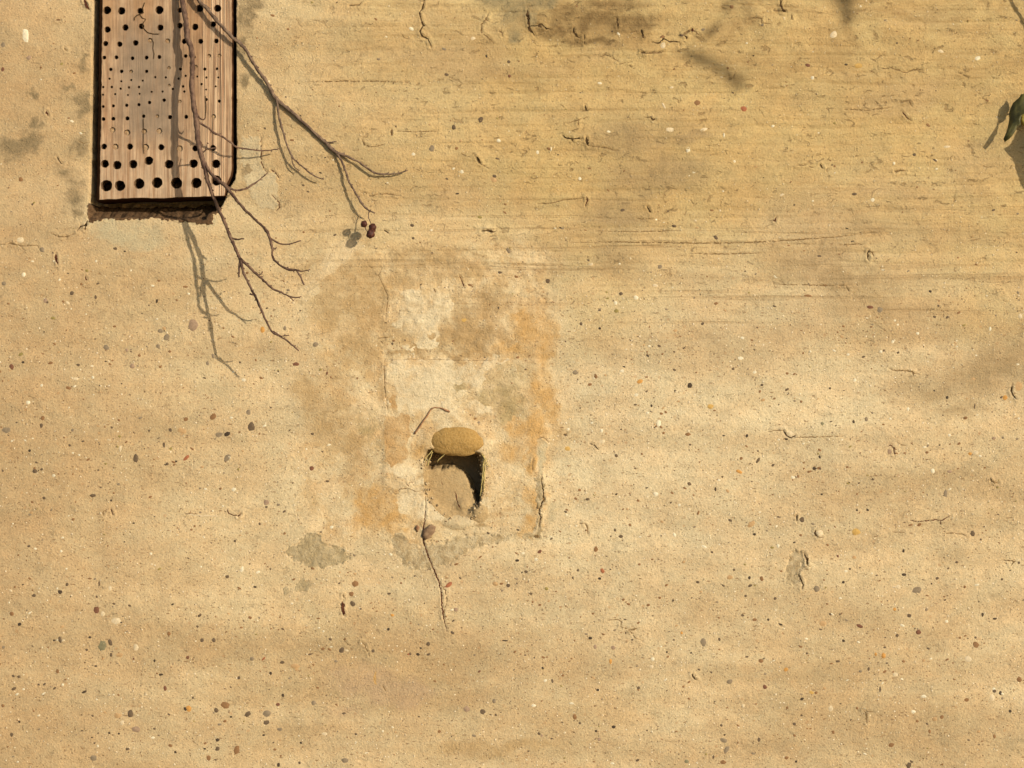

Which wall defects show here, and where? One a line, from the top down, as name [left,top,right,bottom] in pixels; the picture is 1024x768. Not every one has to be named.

crack [401,0,431,45]
crack [396,484,447,630]
spalling [386,475,547,572]
crack [532,464,545,538]